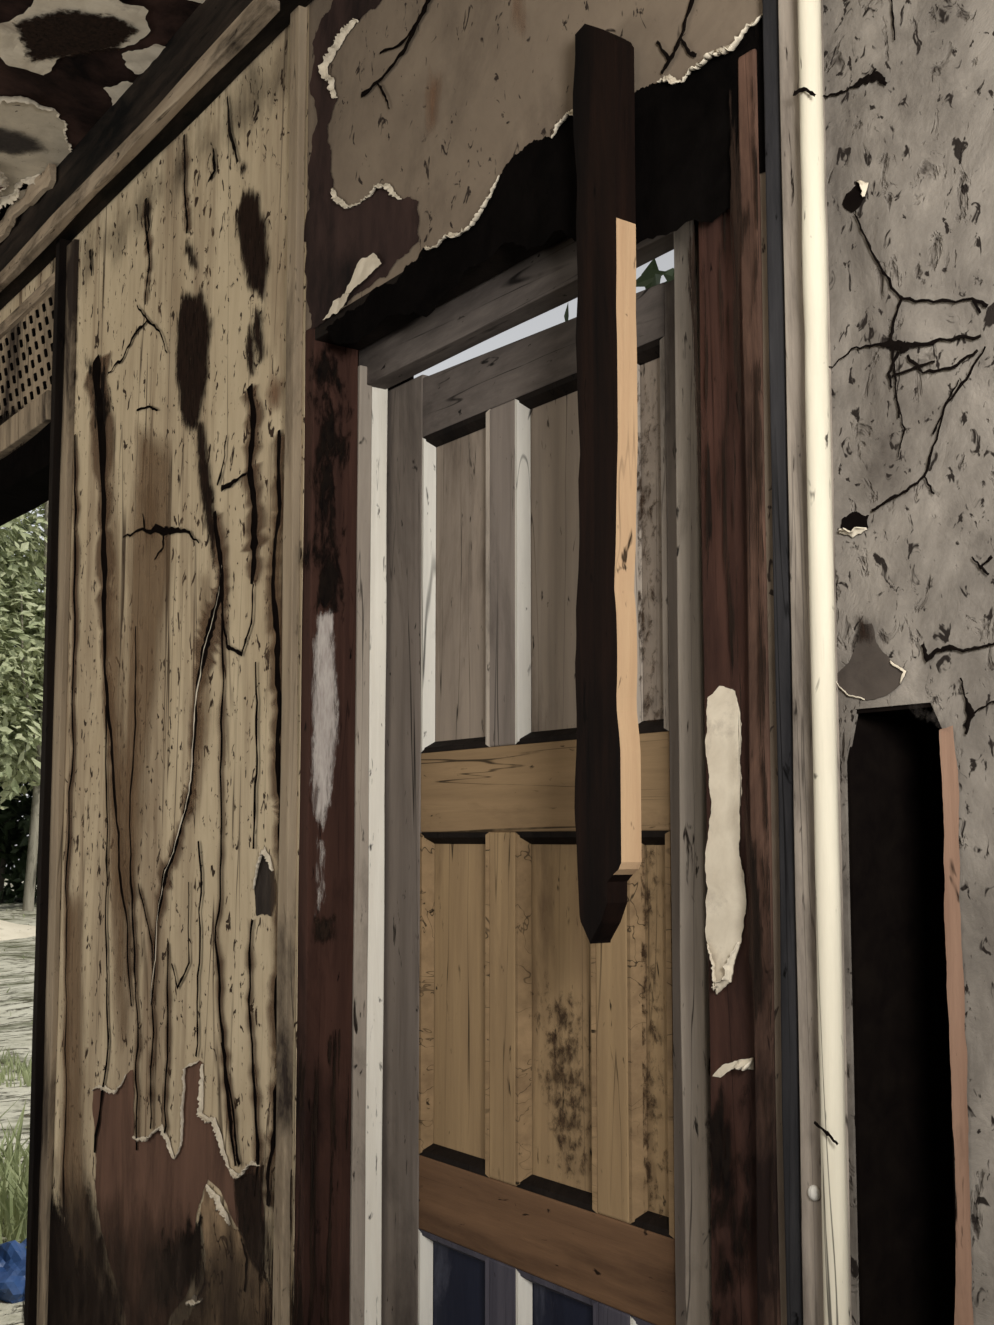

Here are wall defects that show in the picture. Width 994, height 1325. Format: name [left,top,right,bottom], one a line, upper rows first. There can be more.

peeling [0,0,205,152]
crack [361,0,431,109]
peeling [304,0,577,344]
crack [656,0,697,74]
peeling [634,14,765,245]
crack [793,68,887,98]
leakage [73,331,110,428]
leakage [252,307,268,362]
crack [829,214,989,512]
leakage [193,420,215,560]
leakage [107,437,168,985]
peeling [92,1060,273,1325]